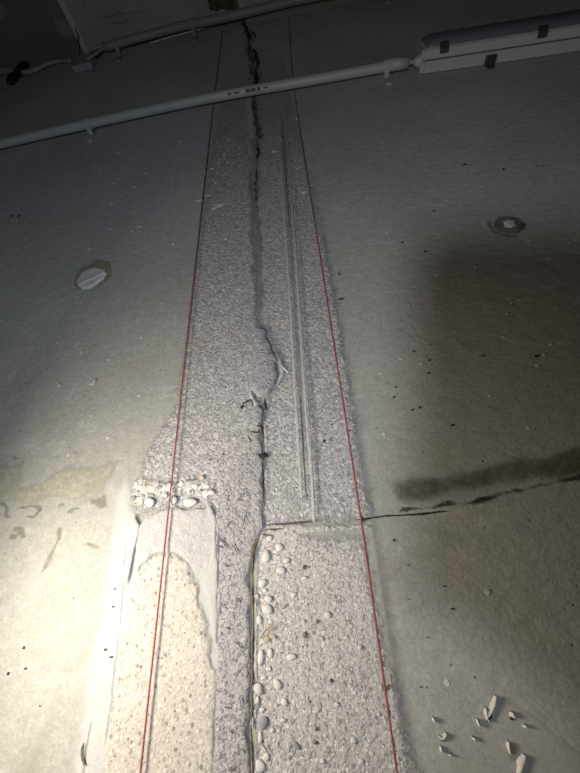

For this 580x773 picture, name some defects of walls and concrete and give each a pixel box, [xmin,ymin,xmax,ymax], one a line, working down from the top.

spalling [124,91,421,773]
crack [358,497,491,522]
peeling [439,695,580,773]